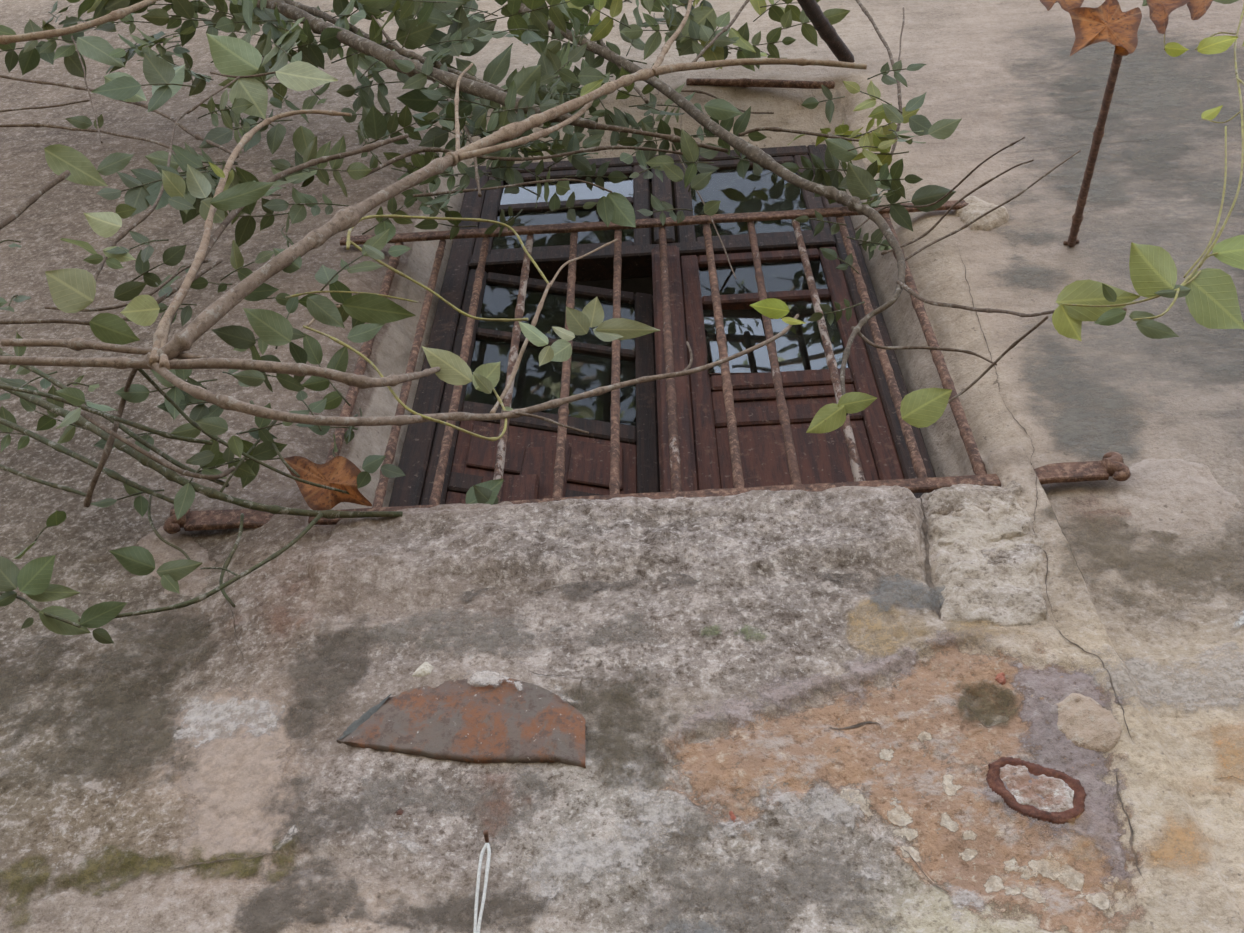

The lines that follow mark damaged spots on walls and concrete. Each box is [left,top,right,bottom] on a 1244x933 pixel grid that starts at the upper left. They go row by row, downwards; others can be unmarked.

crack [957,245,1132,739]
crack [1116,766,1142,876]